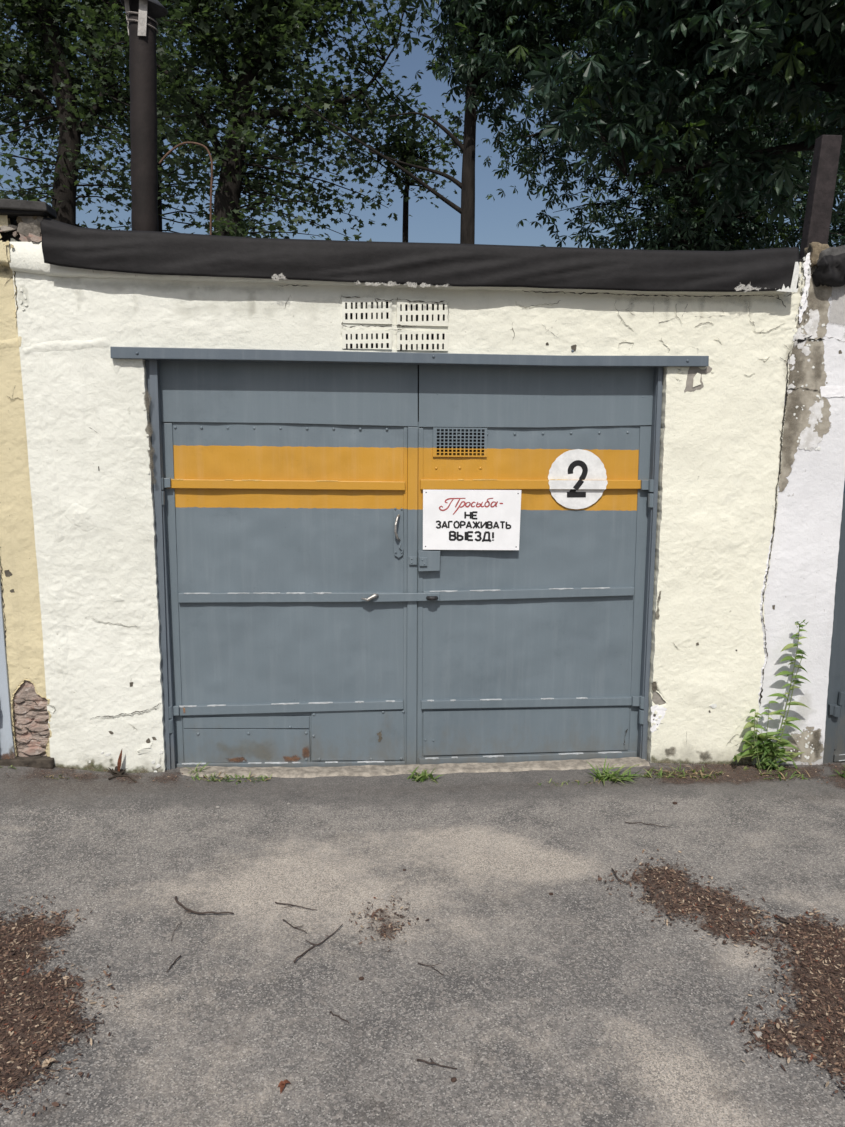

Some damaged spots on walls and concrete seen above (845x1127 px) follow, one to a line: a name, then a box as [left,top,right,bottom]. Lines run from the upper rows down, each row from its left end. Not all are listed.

peeling [677,366,715,392]
peeling [777,242,832,492]
crack [510,290,845,706]
flaking render [6,678,111,781]
rust [284,748,309,762]
peeling [647,726,845,789]